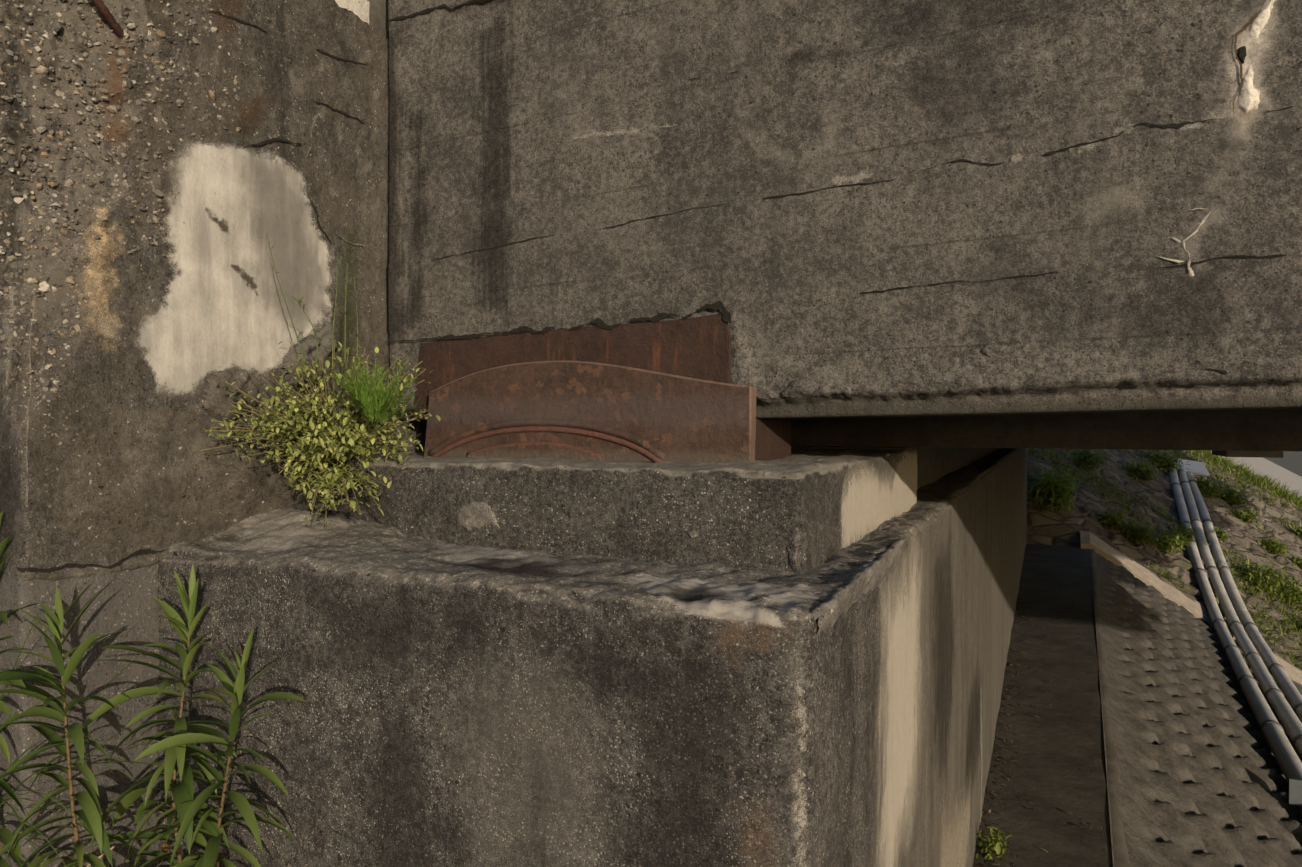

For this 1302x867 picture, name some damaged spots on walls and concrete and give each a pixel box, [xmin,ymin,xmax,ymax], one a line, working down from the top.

crack [387,0,490,23]
water stain [1233,0,1275,123]
crack [1042,106,1294,156]
spalling [0,0,251,409]
crack [593,159,1009,230]
spalling [231,265,258,295]
crack [1157,254,1287,269]
spalling [279,322,338,389]
spalling [199,370,260,422]
crack [16,548,170,582]
water stain [881,563,919,867]
water stain [942,798,970,867]